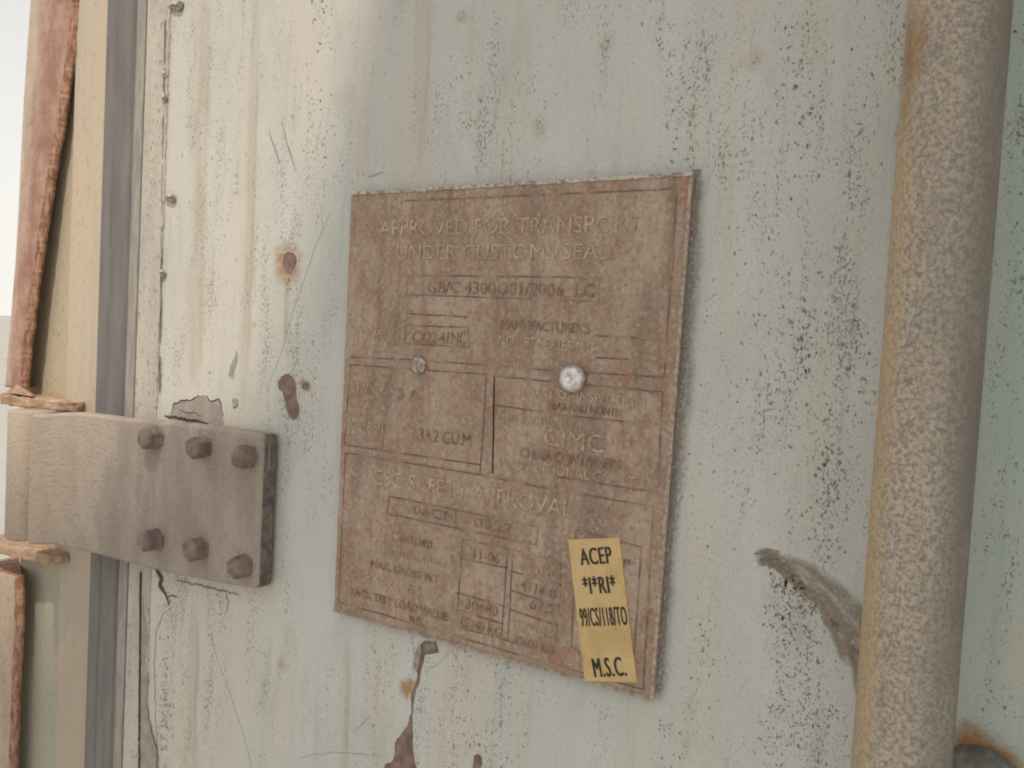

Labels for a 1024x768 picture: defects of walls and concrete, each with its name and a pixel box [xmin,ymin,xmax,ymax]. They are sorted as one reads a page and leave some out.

corrosion [279,251,298,291]
peeling [164,394,238,425]
crack [152,568,240,613]
peeling [752,553,848,768]
peeling [352,639,440,768]